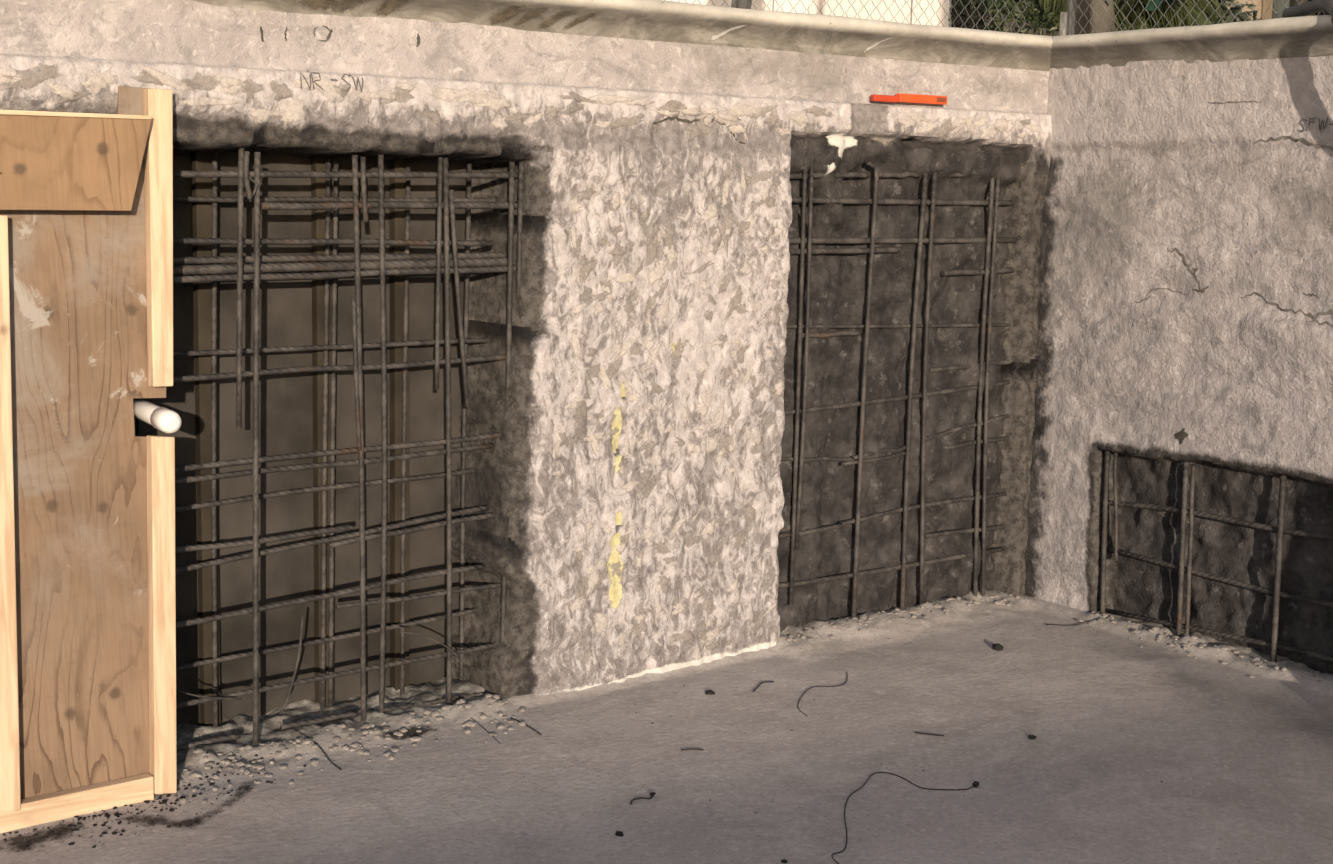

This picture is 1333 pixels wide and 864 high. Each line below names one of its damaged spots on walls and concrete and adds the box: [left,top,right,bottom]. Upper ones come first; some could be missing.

peeling [0,63,118,109]
crack [1209,98,1259,106]
peeling [870,109,1044,146]
crack [1255,136,1333,150]
crack [1133,248,1209,303]
crack [1242,292,1333,327]
spalling [133,66,1017,751]
spalling [1174,428,1188,445]
spalling [1099,451,1333,663]